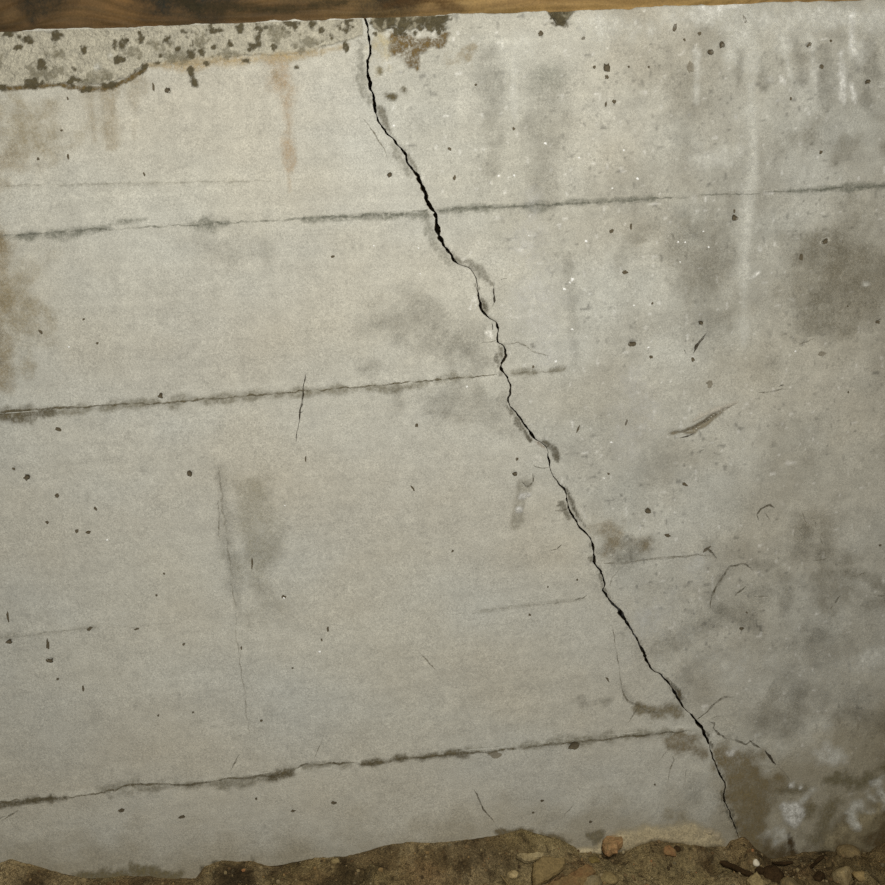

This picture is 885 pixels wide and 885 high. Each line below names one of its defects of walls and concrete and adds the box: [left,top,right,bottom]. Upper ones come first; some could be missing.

spalling [0,15,452,93]
crack [296,374,306,441]
crack [357,18,776,837]
leakage [666,732,836,857]